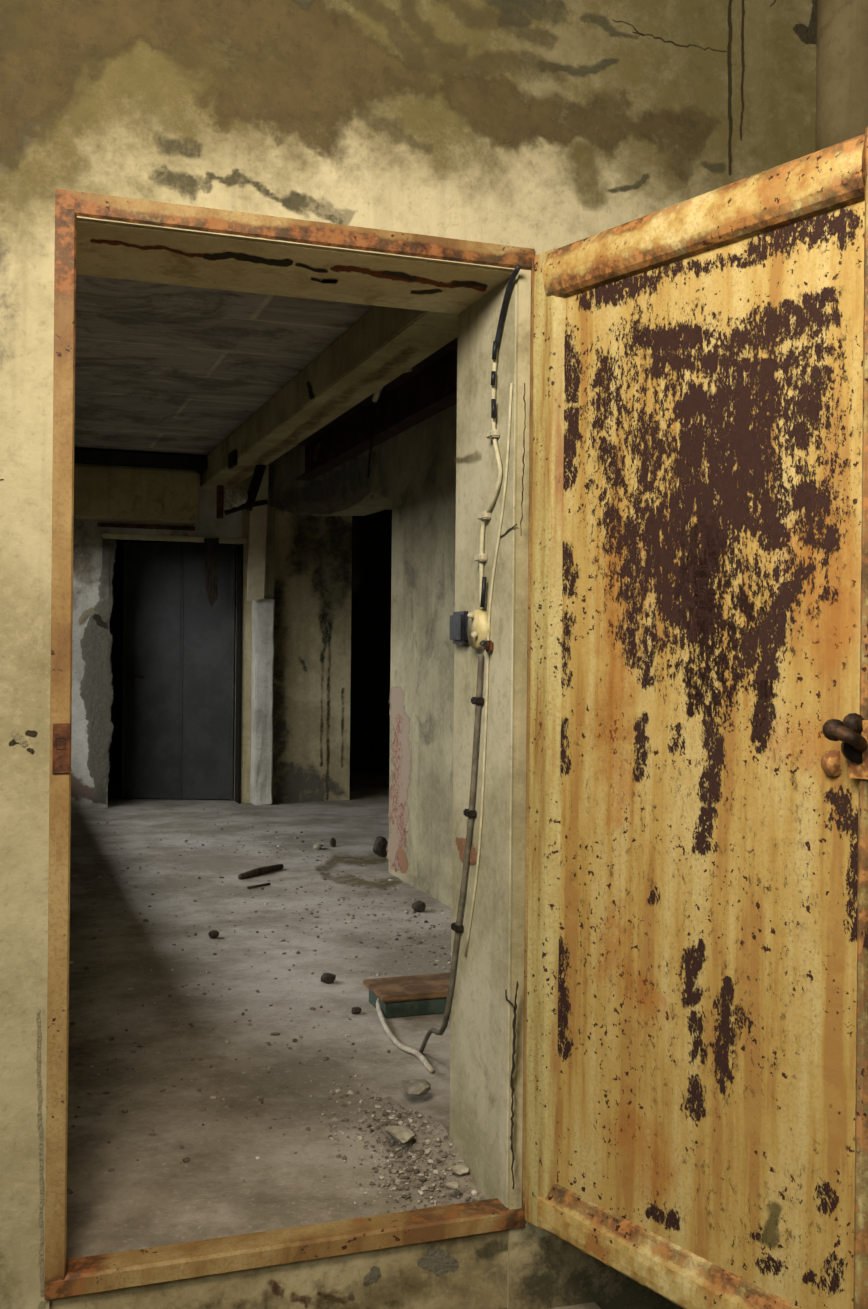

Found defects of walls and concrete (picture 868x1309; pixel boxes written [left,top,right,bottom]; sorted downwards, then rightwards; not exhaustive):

damp [155,169,343,225]
damp [0,0,816,212]
spalling [79,538,117,804]
damp [272,515,356,803]